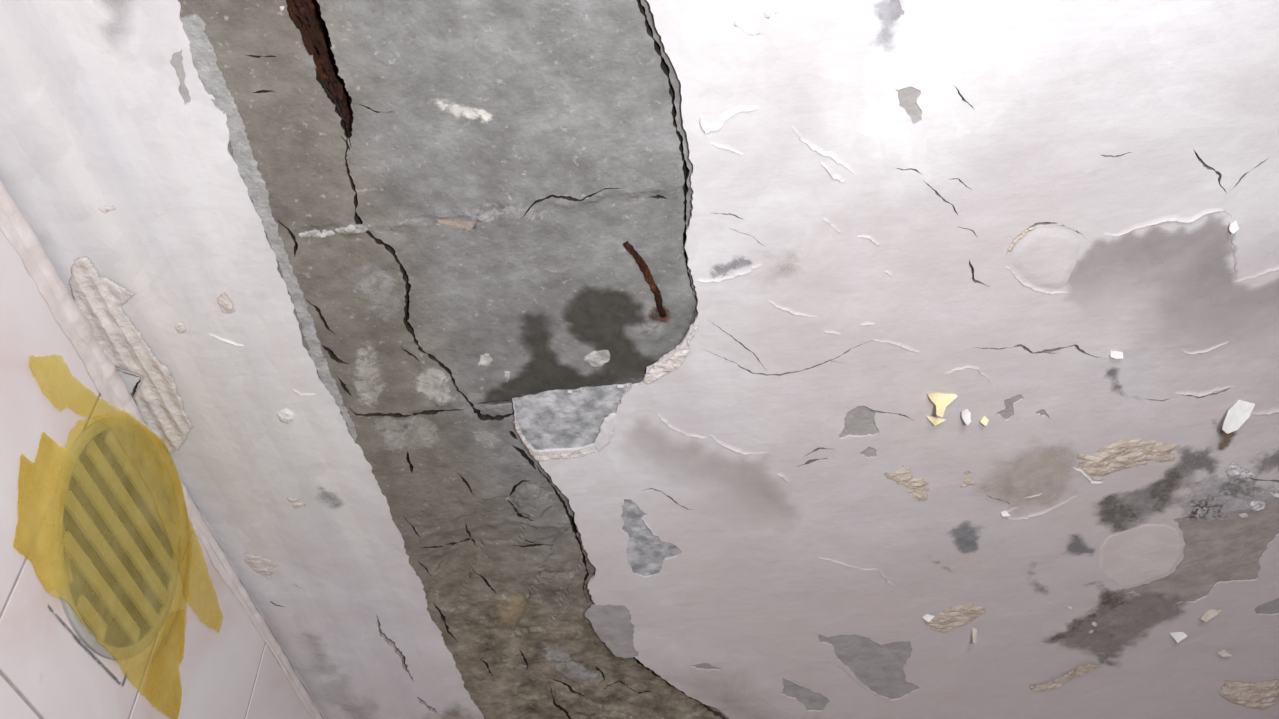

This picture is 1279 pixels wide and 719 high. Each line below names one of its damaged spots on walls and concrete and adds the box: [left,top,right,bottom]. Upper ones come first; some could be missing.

peeling [895,86,922,124]
crack [520,0,873,376]
crack [896,168,990,287]
crack [1193,149,1267,193]
crack [307,66,595,604]
spalling [170,0,769,719]
leakage [487,289,657,404]
peeling [926,393,1023,426]
peeling [1175,385,1279,434]
leakage [1100,450,1279,531]
leakage [1068,536,1094,553]
leakage [1052,591,1180,663]